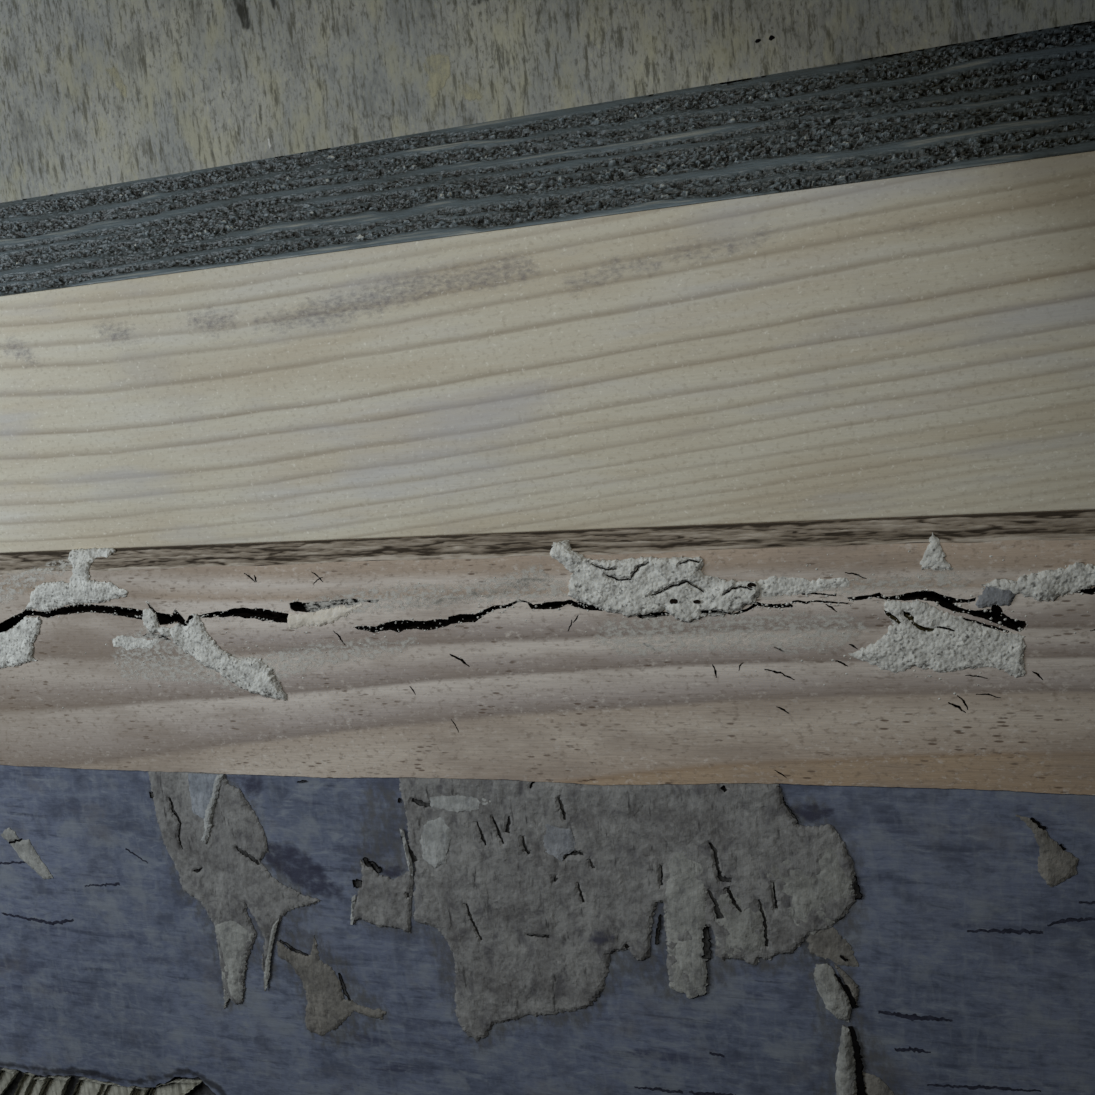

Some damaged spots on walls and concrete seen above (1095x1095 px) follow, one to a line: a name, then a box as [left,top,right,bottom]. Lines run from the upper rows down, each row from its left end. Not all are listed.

crack [0,572,602,645]
crack [701,572,1027,633]
crack [637,612,669,650]
crack [712,647,795,680]
crack [948,675,1001,713]